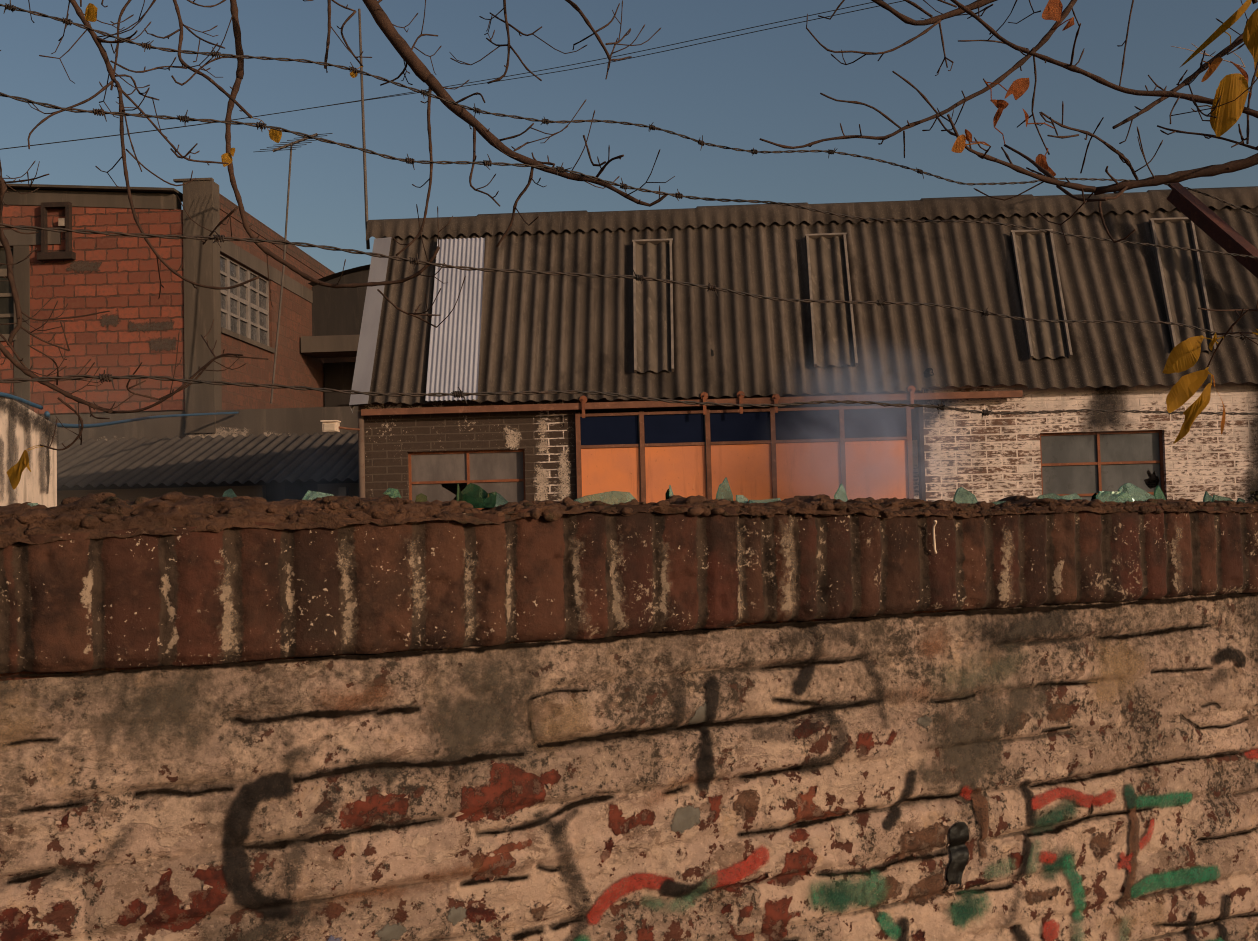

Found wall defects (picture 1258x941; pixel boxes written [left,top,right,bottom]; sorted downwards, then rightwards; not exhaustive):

water stain [0,393,58,505]
water stain [1247,384,1258,503]
peeling [55,812,74,831]
peeling [333,845,346,860]
peeling [338,791,411,829]
peeling [454,760,561,823]
peeling [705,789,760,823]
peeling [721,786,853,941]
peeling [0,907,59,941]
peeling [115,864,228,932]